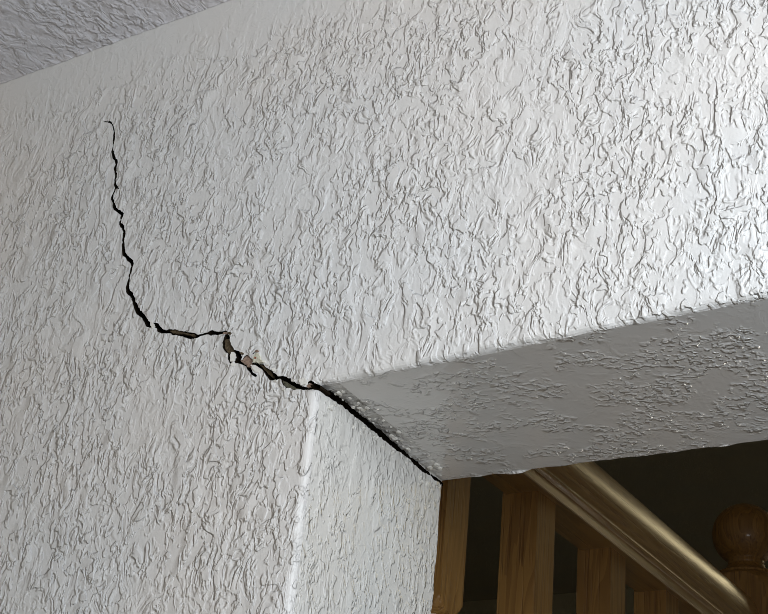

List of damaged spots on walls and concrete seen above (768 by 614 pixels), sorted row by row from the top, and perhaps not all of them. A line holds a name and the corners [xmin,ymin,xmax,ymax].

crack [104,121,443,487]